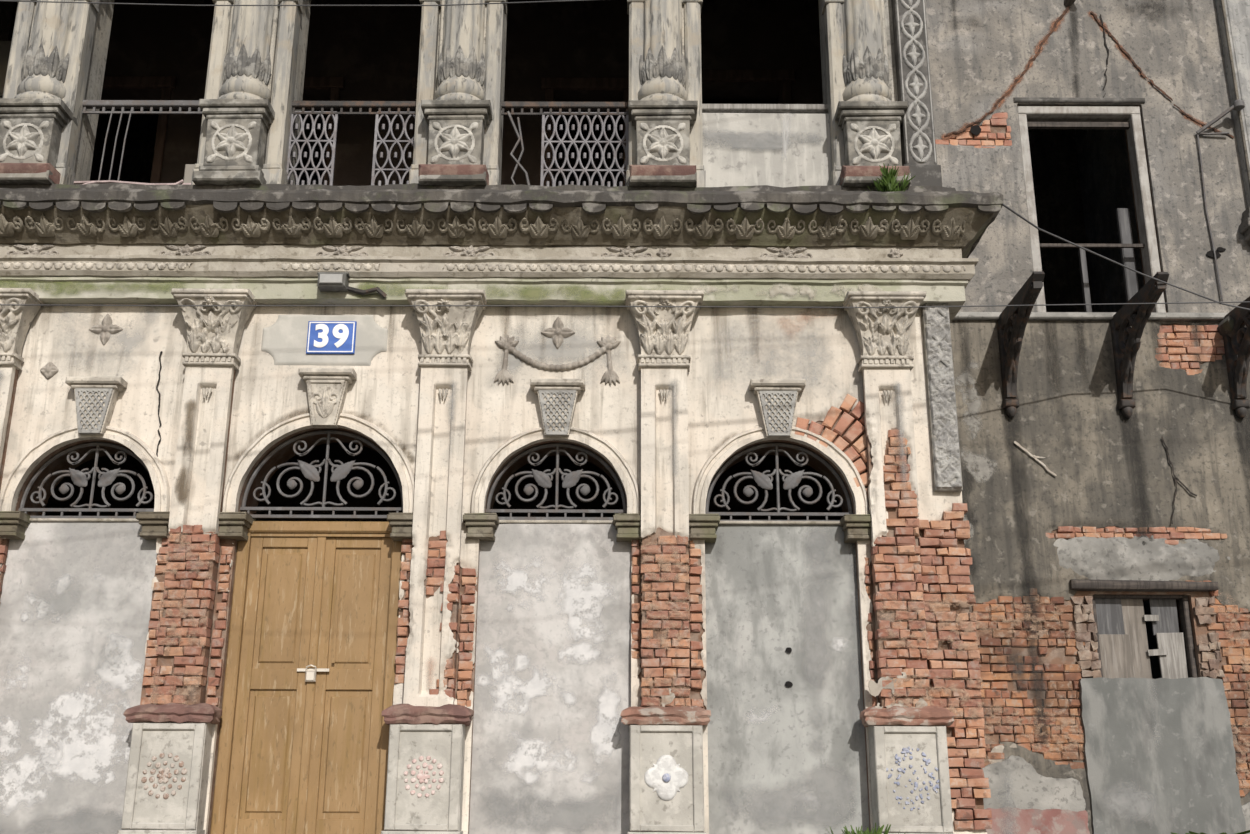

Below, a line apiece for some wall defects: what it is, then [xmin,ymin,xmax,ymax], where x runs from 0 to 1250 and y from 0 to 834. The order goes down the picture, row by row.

spalling [935,112,1012,148]
spalling [1155,325,1225,375]
spalling [795,394,870,514]
spalling [1045,526,1227,545]
spalling [0,525,233,814]
spalling [395,539,413,684]
spalling [426,530,576,714]
peeling [496,560,614,664]
peeling [504,687,621,784]
spalling [631,535,704,708]
spalling [864,429,1086,830]
spalling [1200,581,1250,797]